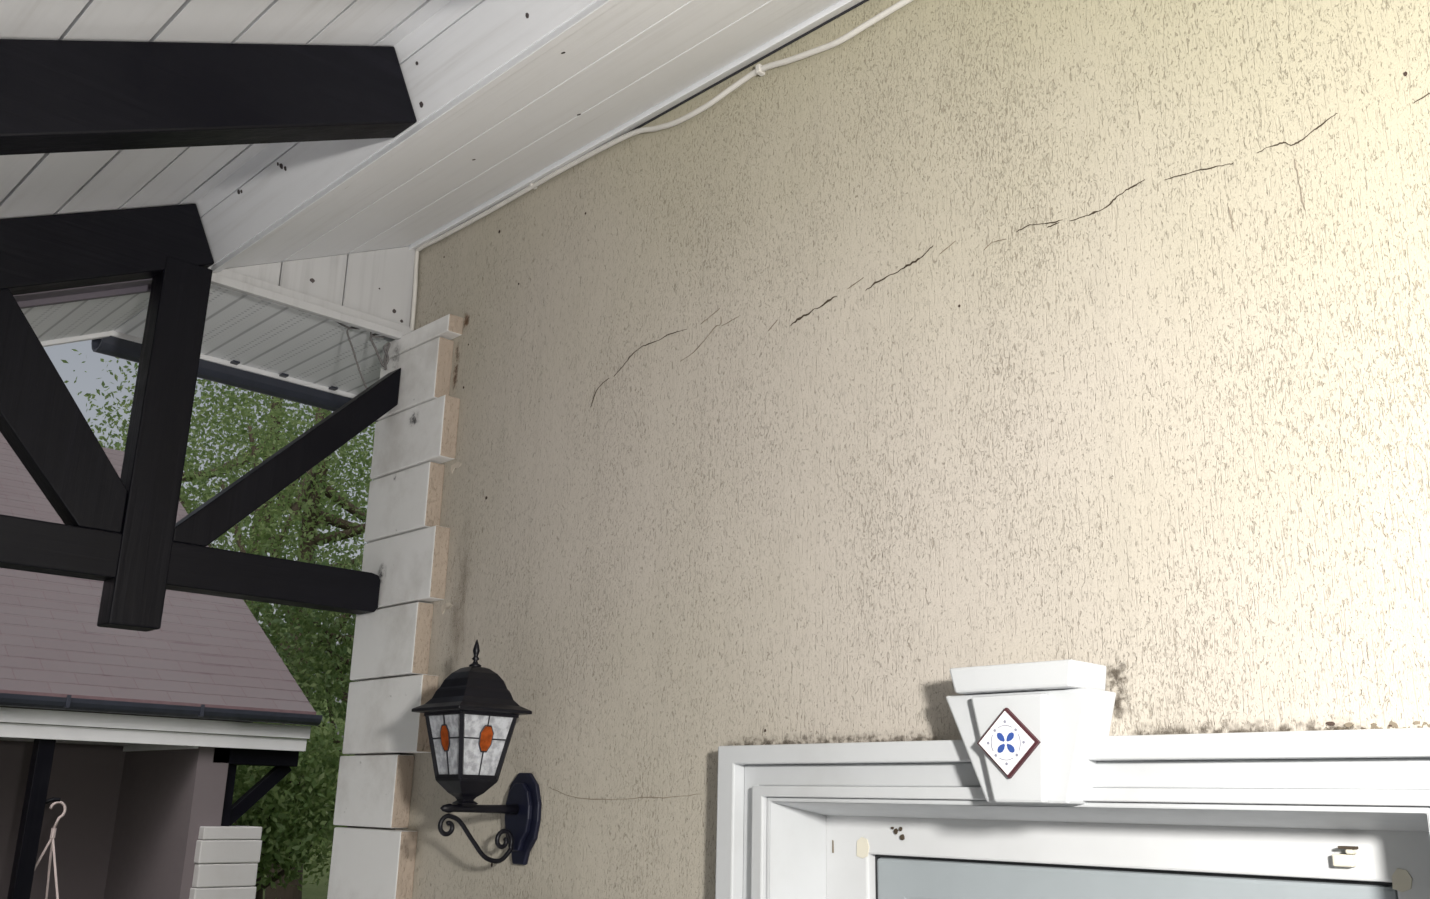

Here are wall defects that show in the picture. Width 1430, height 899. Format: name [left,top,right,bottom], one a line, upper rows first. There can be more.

crack [591,113,1337,406]